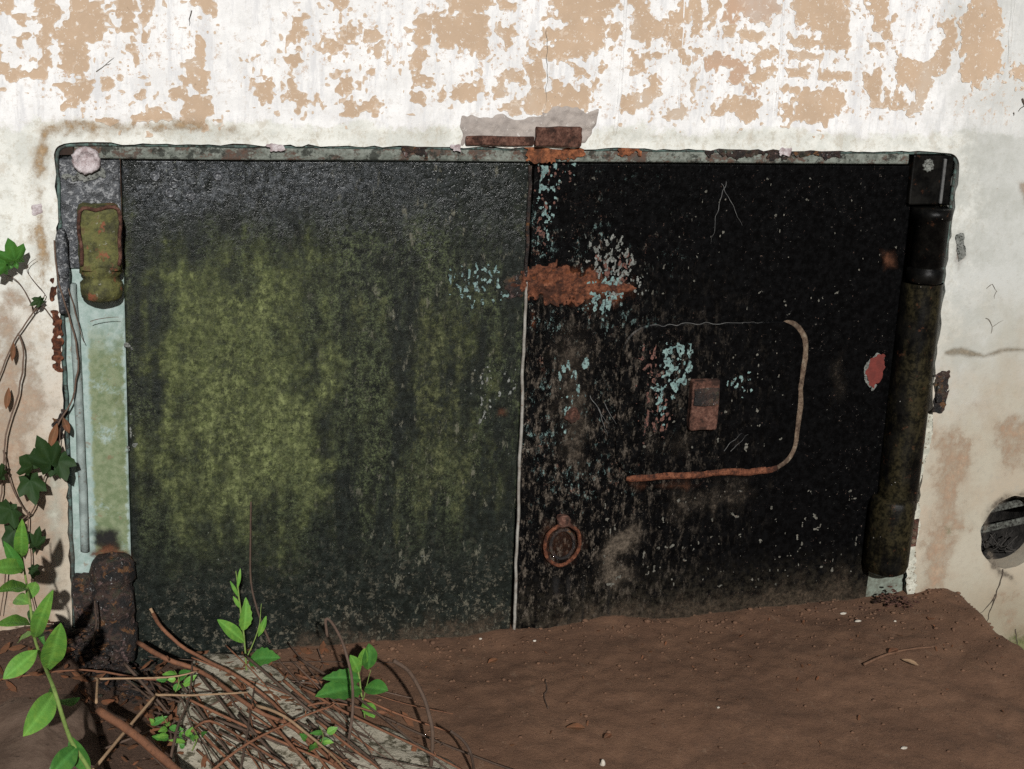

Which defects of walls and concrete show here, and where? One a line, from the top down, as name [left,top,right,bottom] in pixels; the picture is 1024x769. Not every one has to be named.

peeling [0,0,231,173]
peeling [239,0,1024,152]
rust [524,147,586,164]
peeling [31,204,49,275]
peeling [534,162,576,261]
peeling [568,234,664,321]
peeling [630,342,693,448]